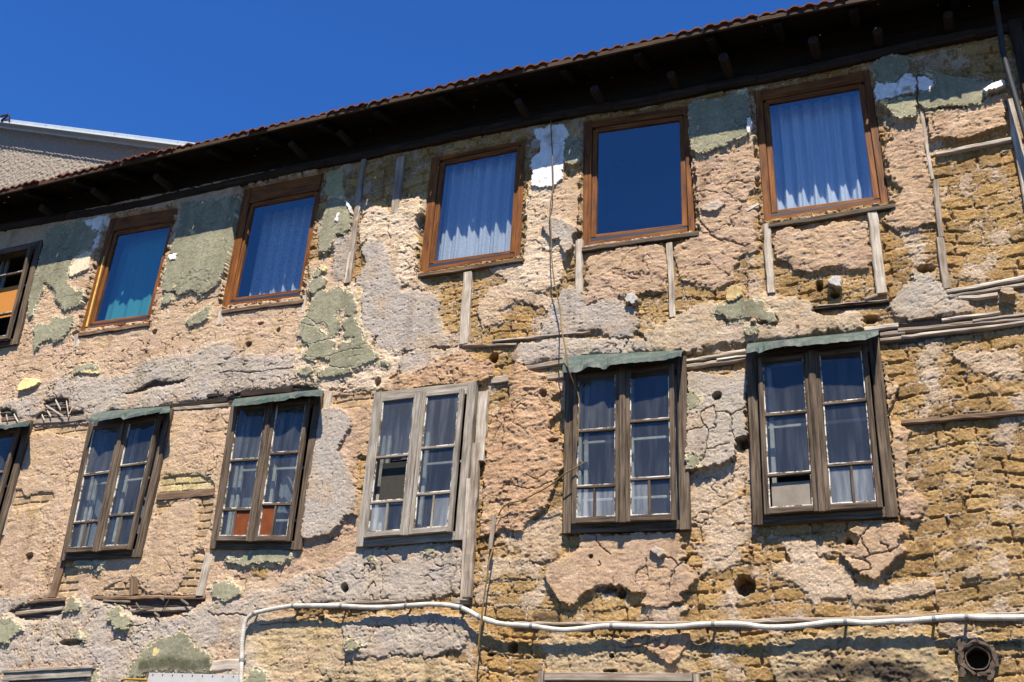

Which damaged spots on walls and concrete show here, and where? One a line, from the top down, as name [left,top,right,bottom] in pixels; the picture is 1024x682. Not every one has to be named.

spalling [419,255,557,363]
spalling [581,238,628,306]
spalling [618,241,680,317]
spalling [714,143,1024,335]
crack [688,405,747,461]
flaking render [156,472,215,595]
spalling [458,379,649,682]
crack [635,553,692,584]
crack [852,523,900,572]
spalling [732,314,1024,682]